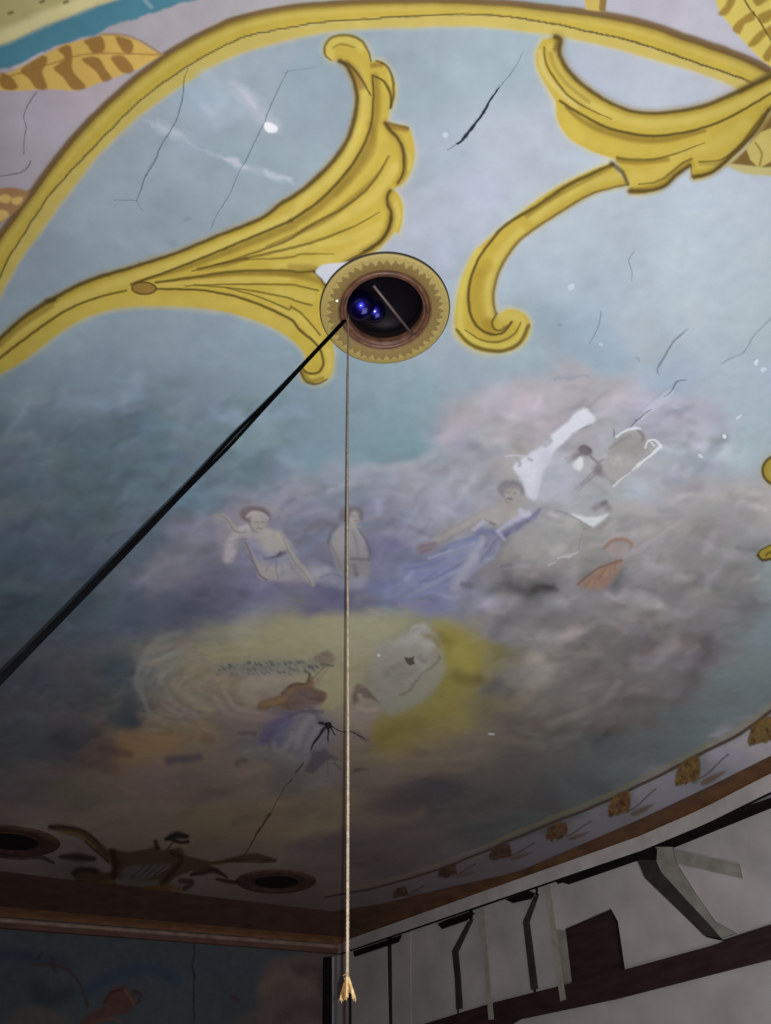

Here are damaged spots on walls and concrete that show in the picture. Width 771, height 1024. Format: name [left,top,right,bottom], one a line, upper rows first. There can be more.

crack [448,87,499,150]
peeling [504,406,598,508]
spalling [611,387,676,488]
crack [243,722,366,857]